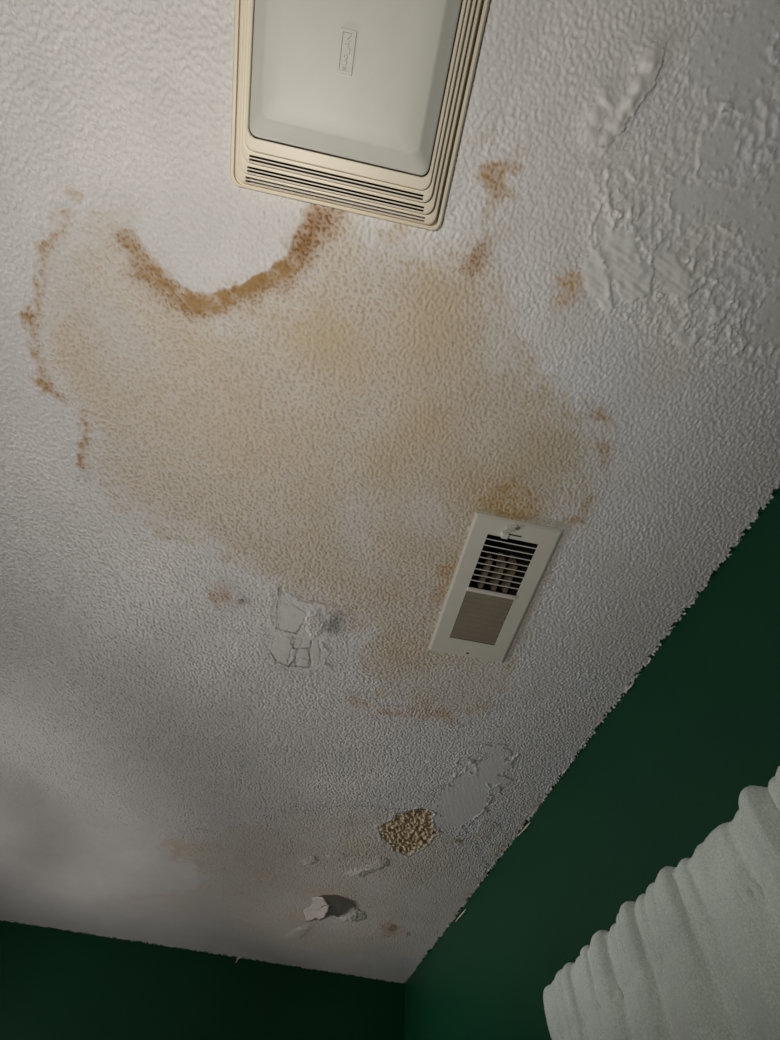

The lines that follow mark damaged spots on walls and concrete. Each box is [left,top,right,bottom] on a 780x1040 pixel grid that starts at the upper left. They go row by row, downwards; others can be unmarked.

flaking render [582,247,614,316]
damp [18,142,621,728]
flaking render [377,809,441,857]